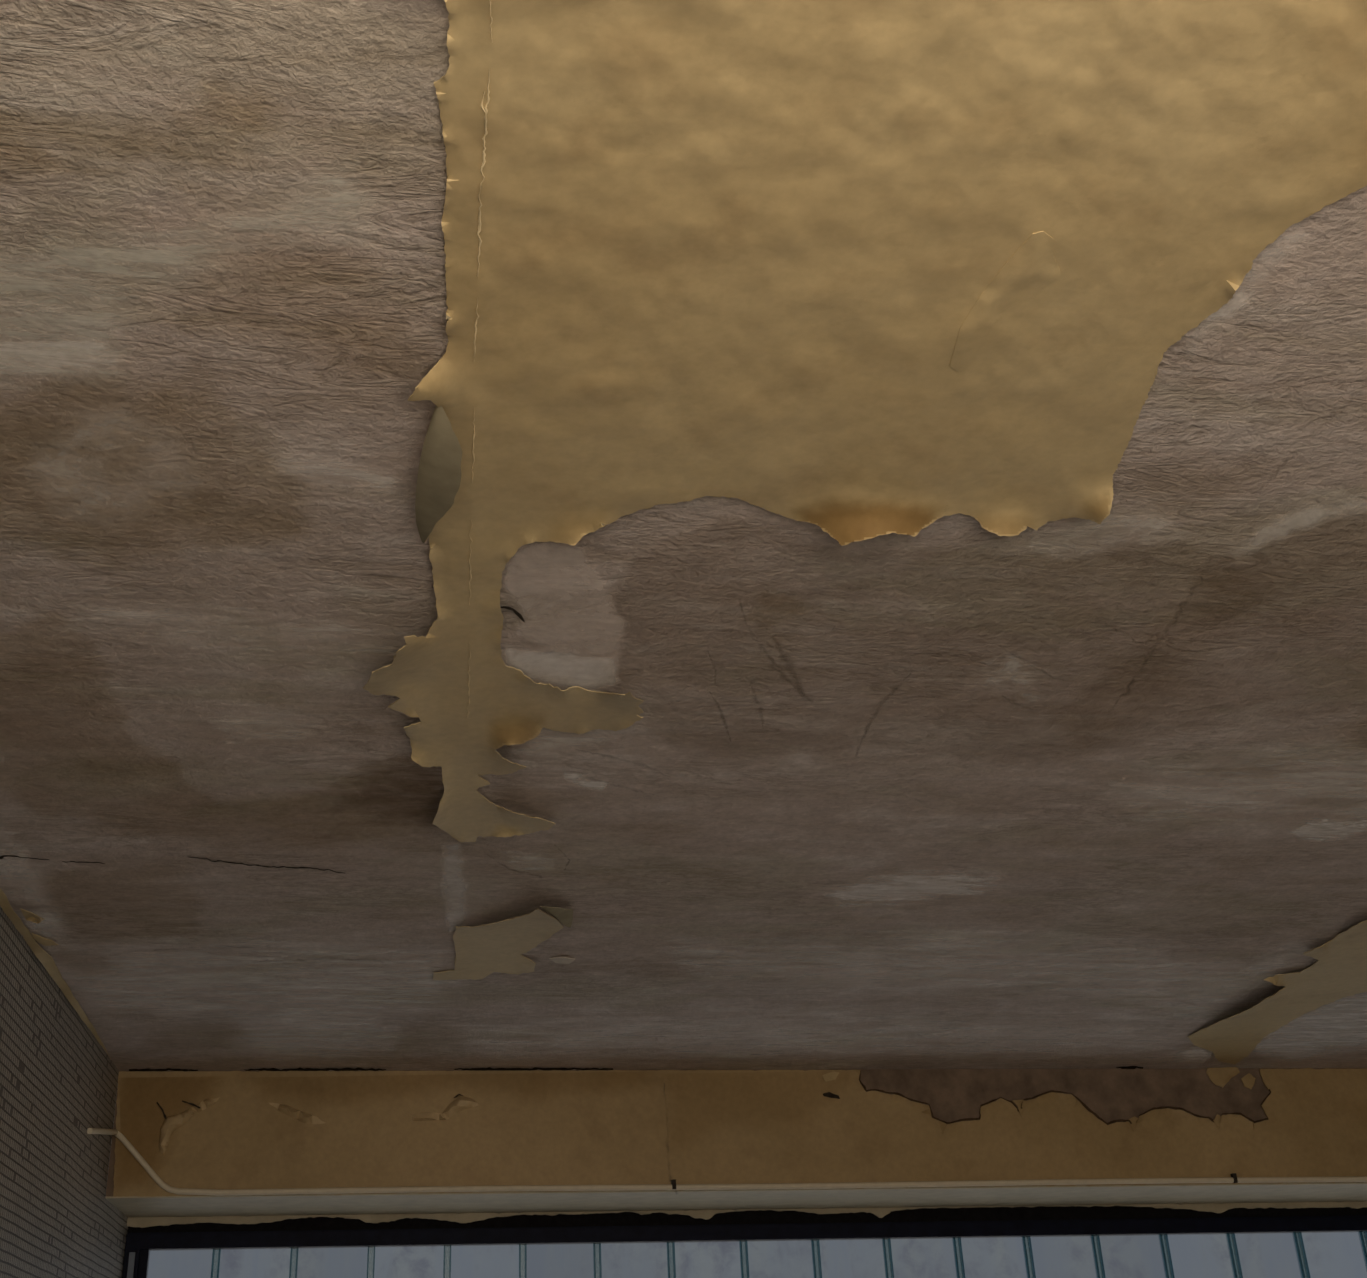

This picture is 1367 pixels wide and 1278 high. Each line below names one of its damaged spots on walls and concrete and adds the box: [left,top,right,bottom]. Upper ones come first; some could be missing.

peeling [363,0,1367,842]
crack [0,855,105,864]
peeling [0,889,111,1059]
crack [190,857,343,873]
peeling [433,906,575,980]
peeling [859,920,1367,1131]